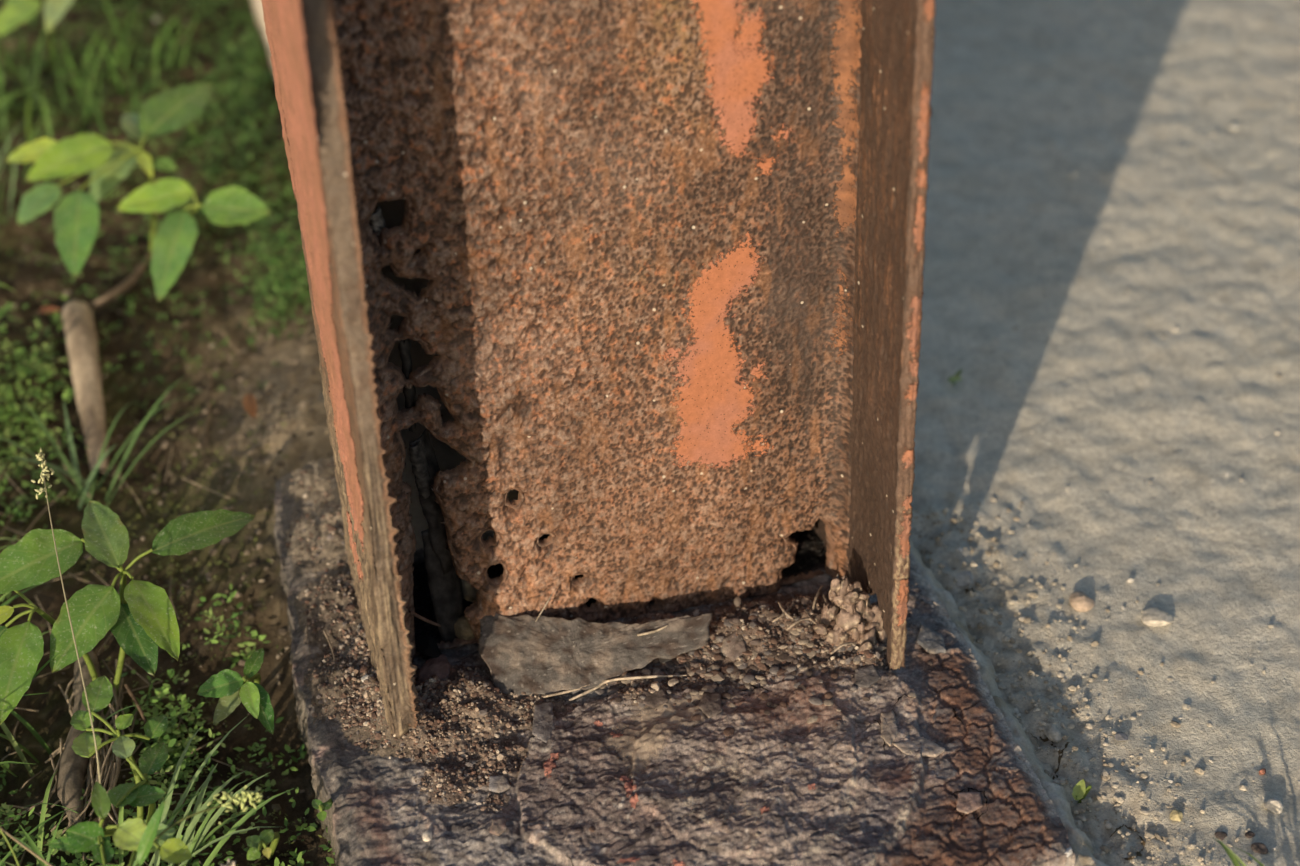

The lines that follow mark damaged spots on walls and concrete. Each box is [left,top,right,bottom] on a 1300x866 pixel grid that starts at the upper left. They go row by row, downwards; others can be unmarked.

rust [484,562,508,589]
rust [778,516,836,587]